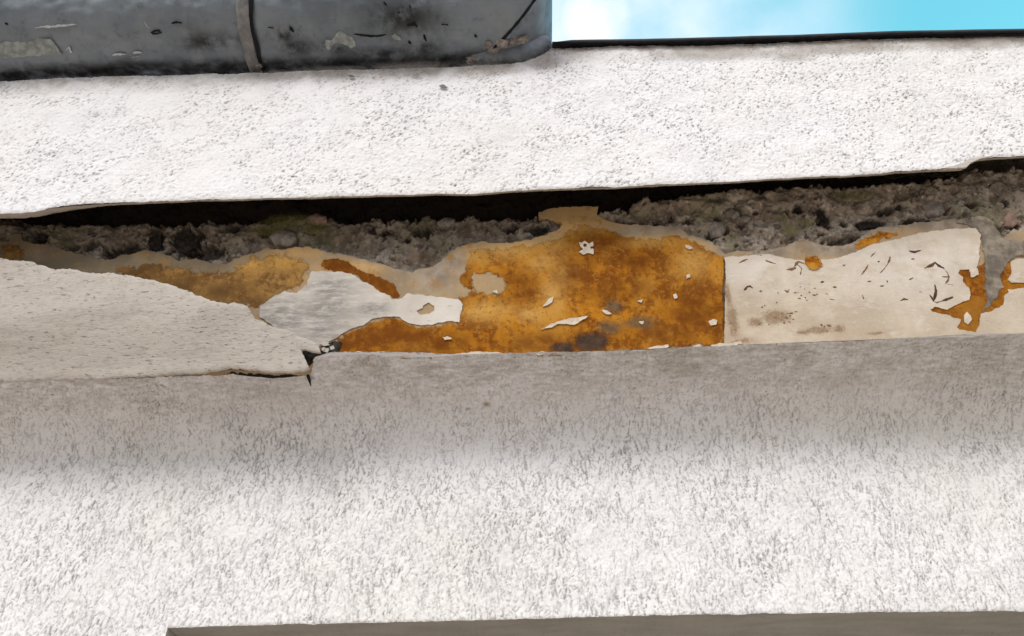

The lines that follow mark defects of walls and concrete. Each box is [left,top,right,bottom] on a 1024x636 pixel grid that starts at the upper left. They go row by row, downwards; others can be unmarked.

flaking render [0,156,1024,383]
corrosion [854,231,898,249]
corrosion [931,218,1024,332]
crack [227,371,311,386]